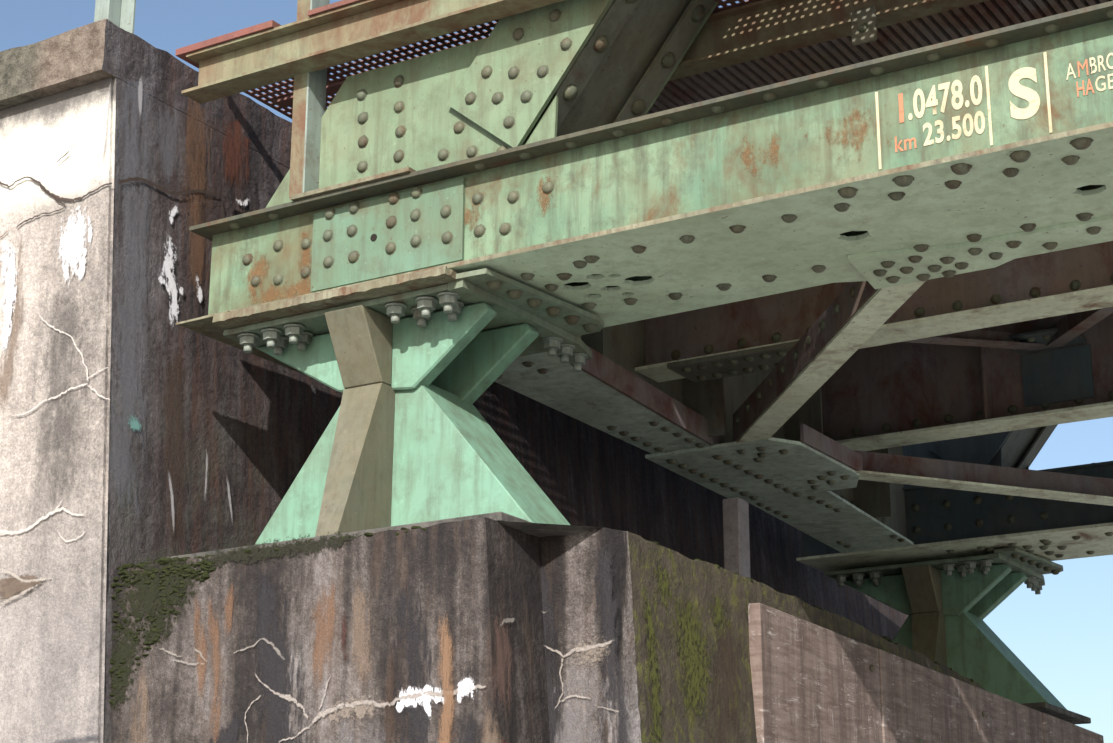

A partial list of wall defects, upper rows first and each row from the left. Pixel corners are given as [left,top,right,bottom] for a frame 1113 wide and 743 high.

damp [0,240,17,350]
damp [59,207,92,282]
crack [0,151,224,238]
damp [110,81,203,500]
rust [247,233,311,303]
crack [12,312,110,416]
crack [0,501,84,542]
spalling [0,569,51,606]
damp [209,573,307,743]
crack [234,638,486,742]
damp [371,584,474,743]
crack [546,638,619,712]